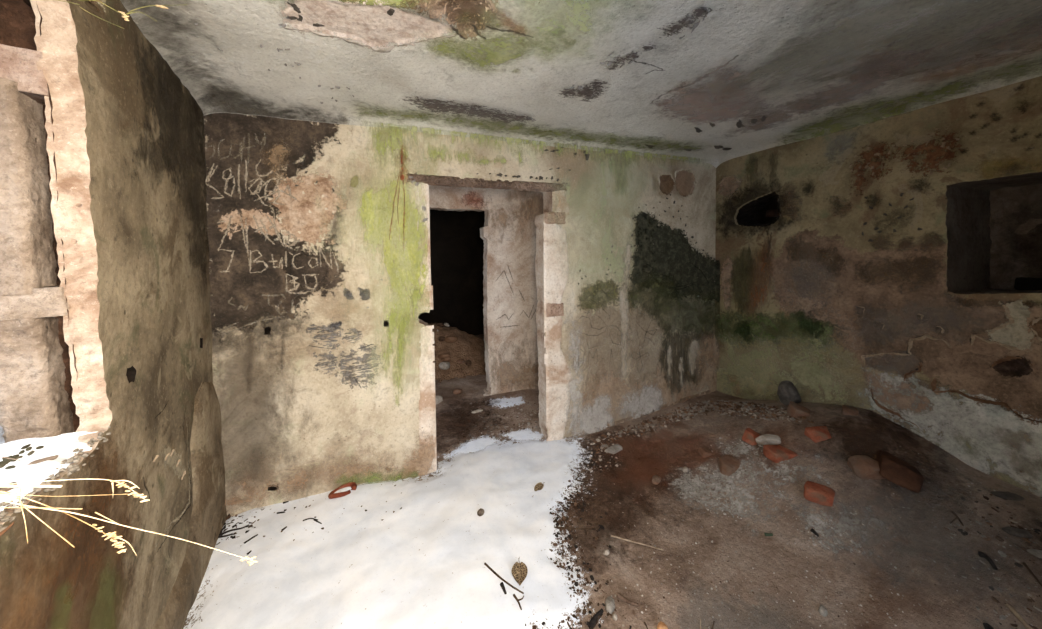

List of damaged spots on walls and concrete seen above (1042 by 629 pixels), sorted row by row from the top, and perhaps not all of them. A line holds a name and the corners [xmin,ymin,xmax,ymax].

spalling [277,0,499,53]
spalling [214,144,348,246]
rust [389,145,405,244]
spalling [657,167,697,197]
damp [383,290,421,403]
damp [569,181,1042,435]
peeling [985,299,1042,378]
damp [218,334,435,506]
peeling [931,378,1042,423]